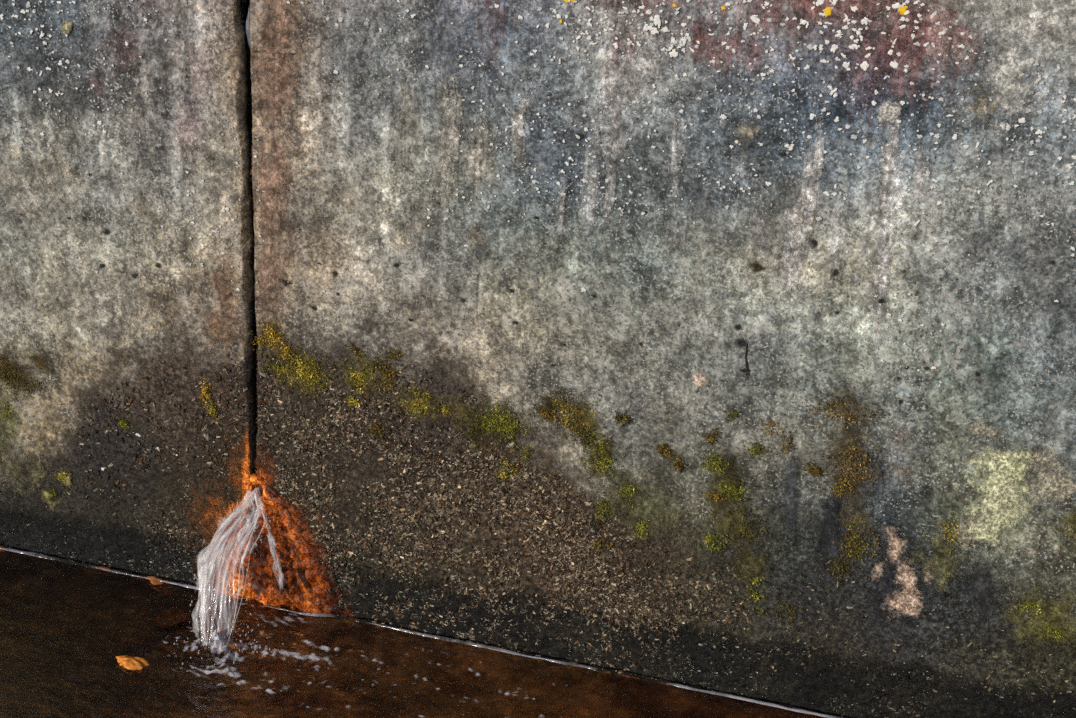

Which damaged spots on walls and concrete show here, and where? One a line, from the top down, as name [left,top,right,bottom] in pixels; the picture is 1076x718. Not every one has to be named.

damp [0,146,80,232]
damp [49,271,149,338]
damp [175,46,237,220]
damp [394,90,492,207]
damp [512,102,525,168]
damp [582,24,660,222]
damp [671,124,682,188]
damp [746,136,823,294]
damp [687,0,1076,135]
damp [861,121,925,340]
corrosion [196,435,351,619]
damp [0,322,1076,697]